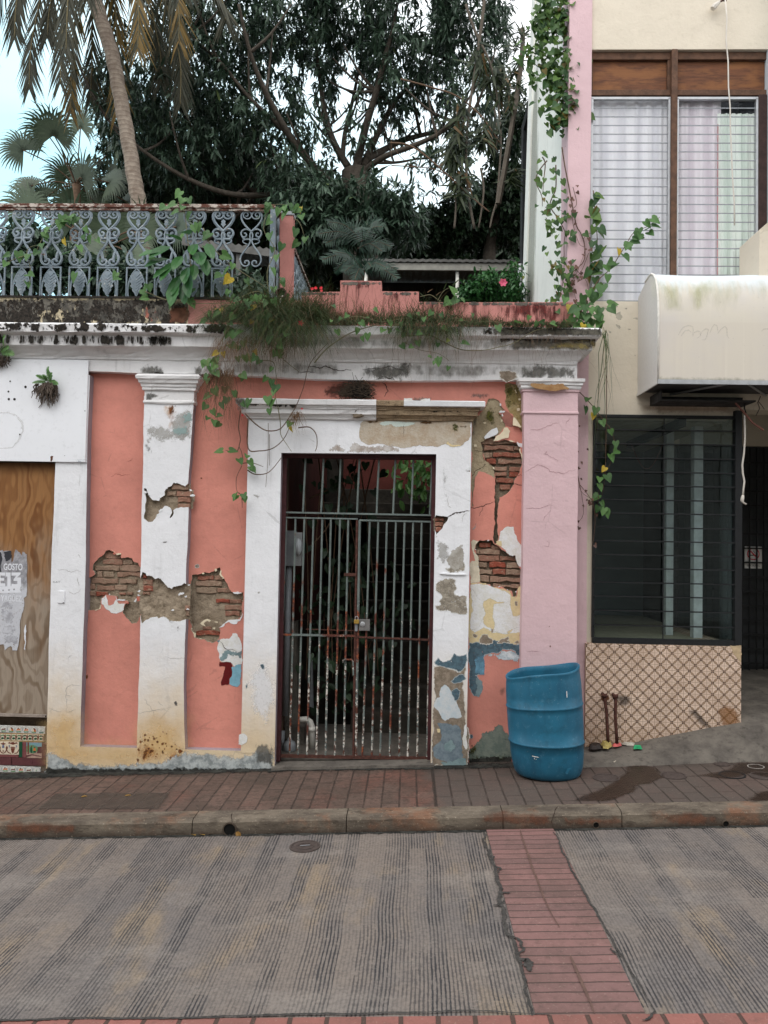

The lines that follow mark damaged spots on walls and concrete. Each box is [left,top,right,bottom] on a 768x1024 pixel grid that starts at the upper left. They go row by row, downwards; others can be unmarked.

mould [0,298,227,346]
mould [522,364,574,378]
peeling [148,411,192,451]
spalling [143,482,196,522]
peeling [330,370,569,766]
spalling [90,550,273,717]
water stain [45,726,274,773]
corrosion [137,731,183,762]